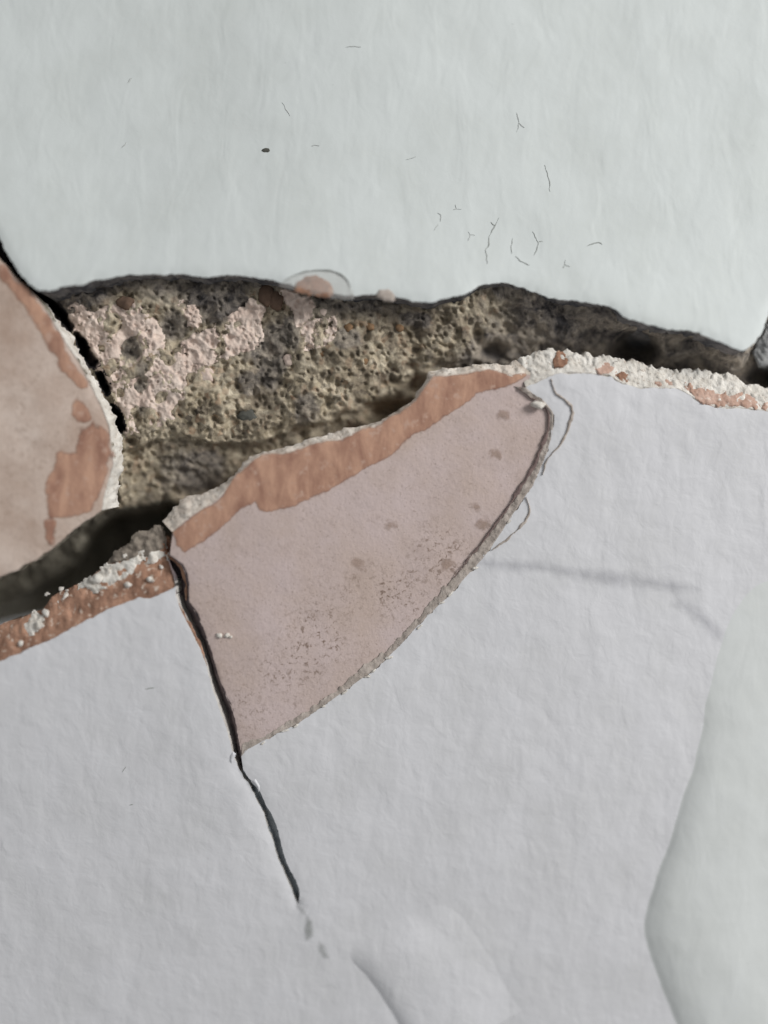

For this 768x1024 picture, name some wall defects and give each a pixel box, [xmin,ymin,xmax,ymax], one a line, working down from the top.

crack [0,499,300,901]
peeling [0,258,768,756]